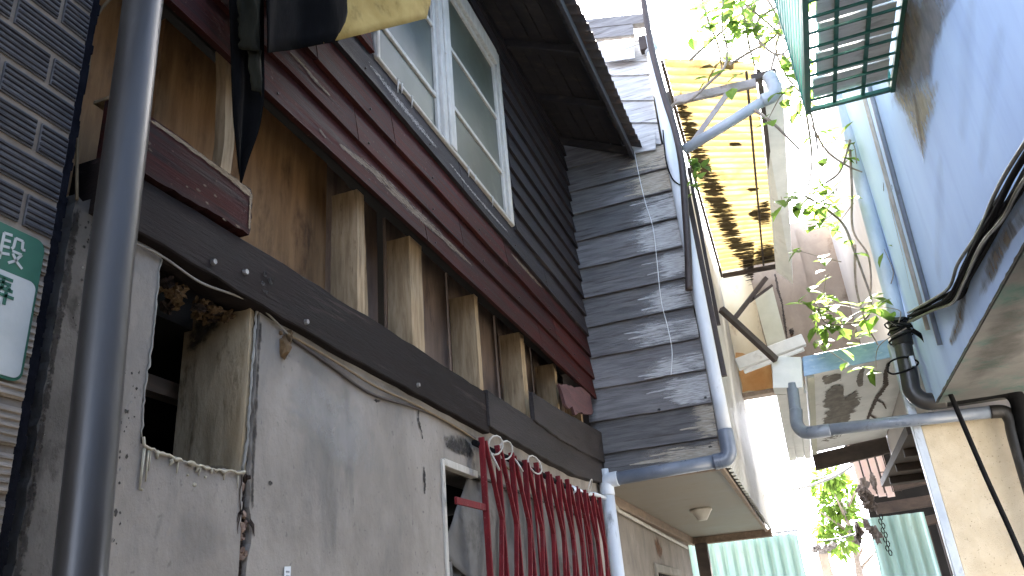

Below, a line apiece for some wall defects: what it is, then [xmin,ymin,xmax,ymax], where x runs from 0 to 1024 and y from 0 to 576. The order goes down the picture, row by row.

leakage [896,0,946,158]
peeling [618,145,699,347]
spalling [121,259,163,437]
spalling [241,311,258,471]
crack [237,315,262,576]
peeling [630,352,720,465]